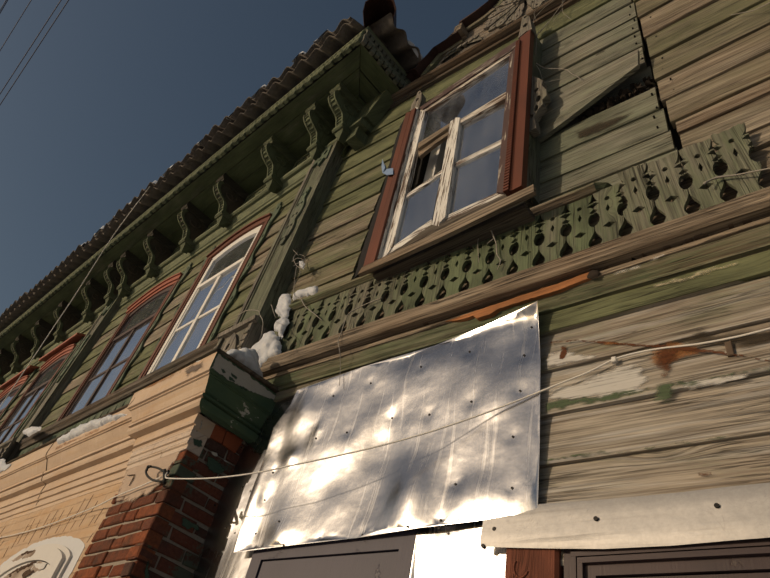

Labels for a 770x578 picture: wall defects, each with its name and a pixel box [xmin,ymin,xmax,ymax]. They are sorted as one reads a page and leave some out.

corrosion [551,340,743,376]
peeling [212,354,275,400]
peeling [546,388,649,411]
crack [0,443,104,557]
flaking render [4,550,46,578]